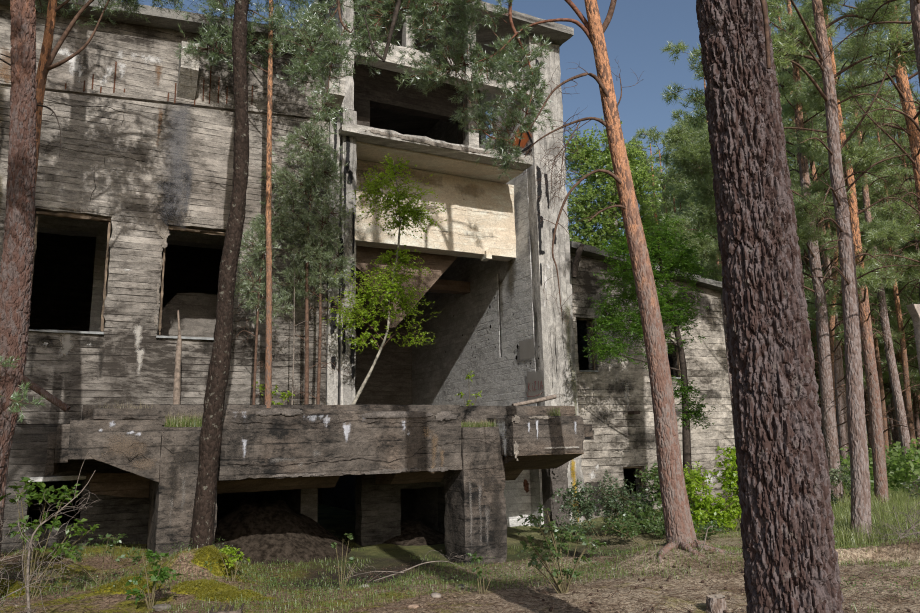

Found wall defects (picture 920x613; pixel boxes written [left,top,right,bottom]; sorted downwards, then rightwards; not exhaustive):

rust [194,64,228,105]
water stain [330,112,356,379]
water stain [528,166,557,284]
water stain [135,326,144,370]